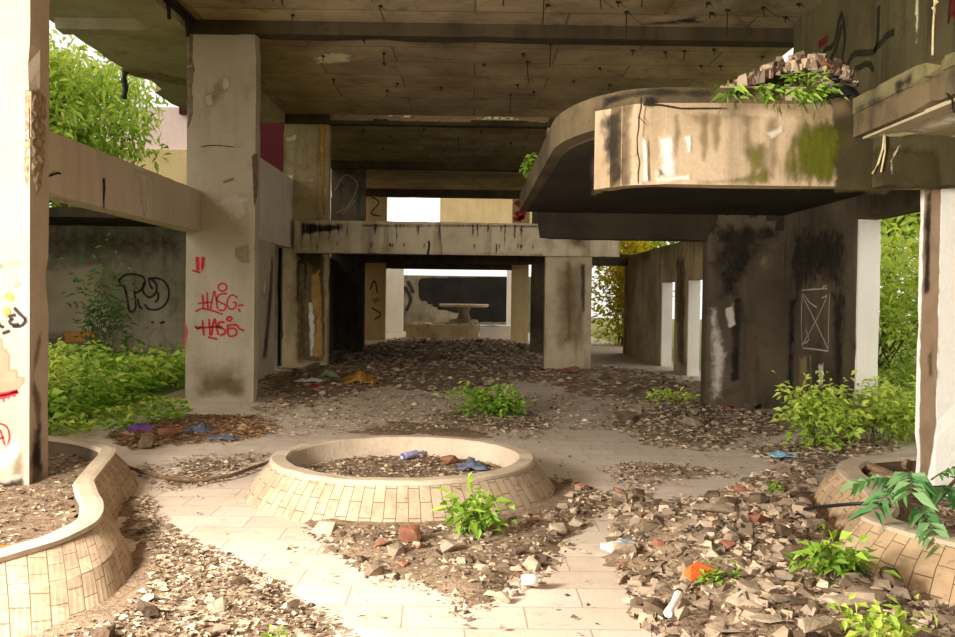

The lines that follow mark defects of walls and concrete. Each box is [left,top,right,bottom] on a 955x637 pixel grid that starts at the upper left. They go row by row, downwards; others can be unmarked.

spalling [24,88,47,195]
leakage [596,89,709,191]
leakage [701,118,718,147]
leakage [736,136,774,183]
leakage [365,224,489,247]